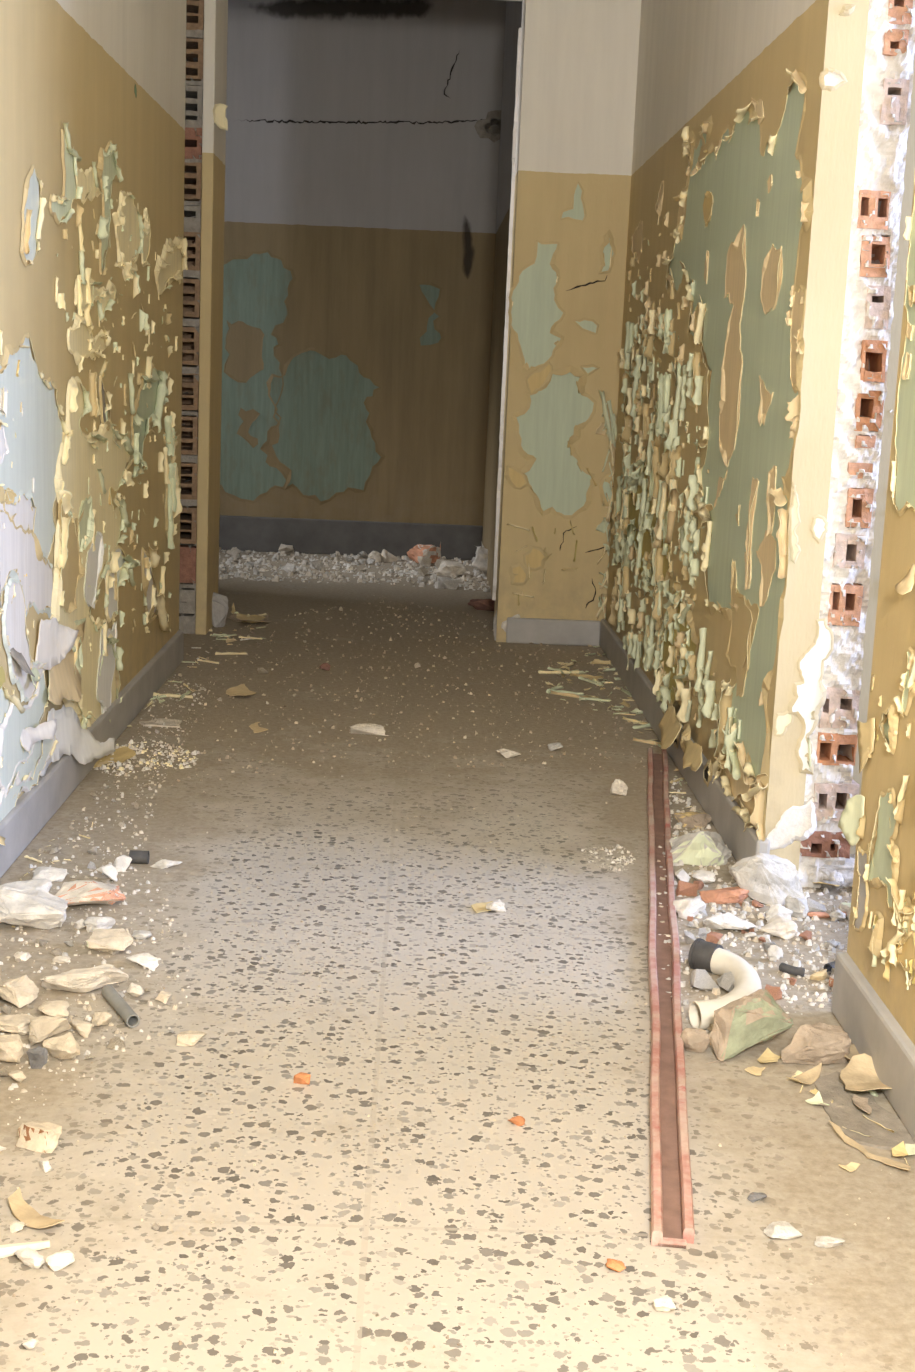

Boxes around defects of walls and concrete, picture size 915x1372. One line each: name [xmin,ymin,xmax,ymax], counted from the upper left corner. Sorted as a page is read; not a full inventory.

crack [237,50,491,126]
peeling [220,250,385,505]
peeling [474,0,915,990]